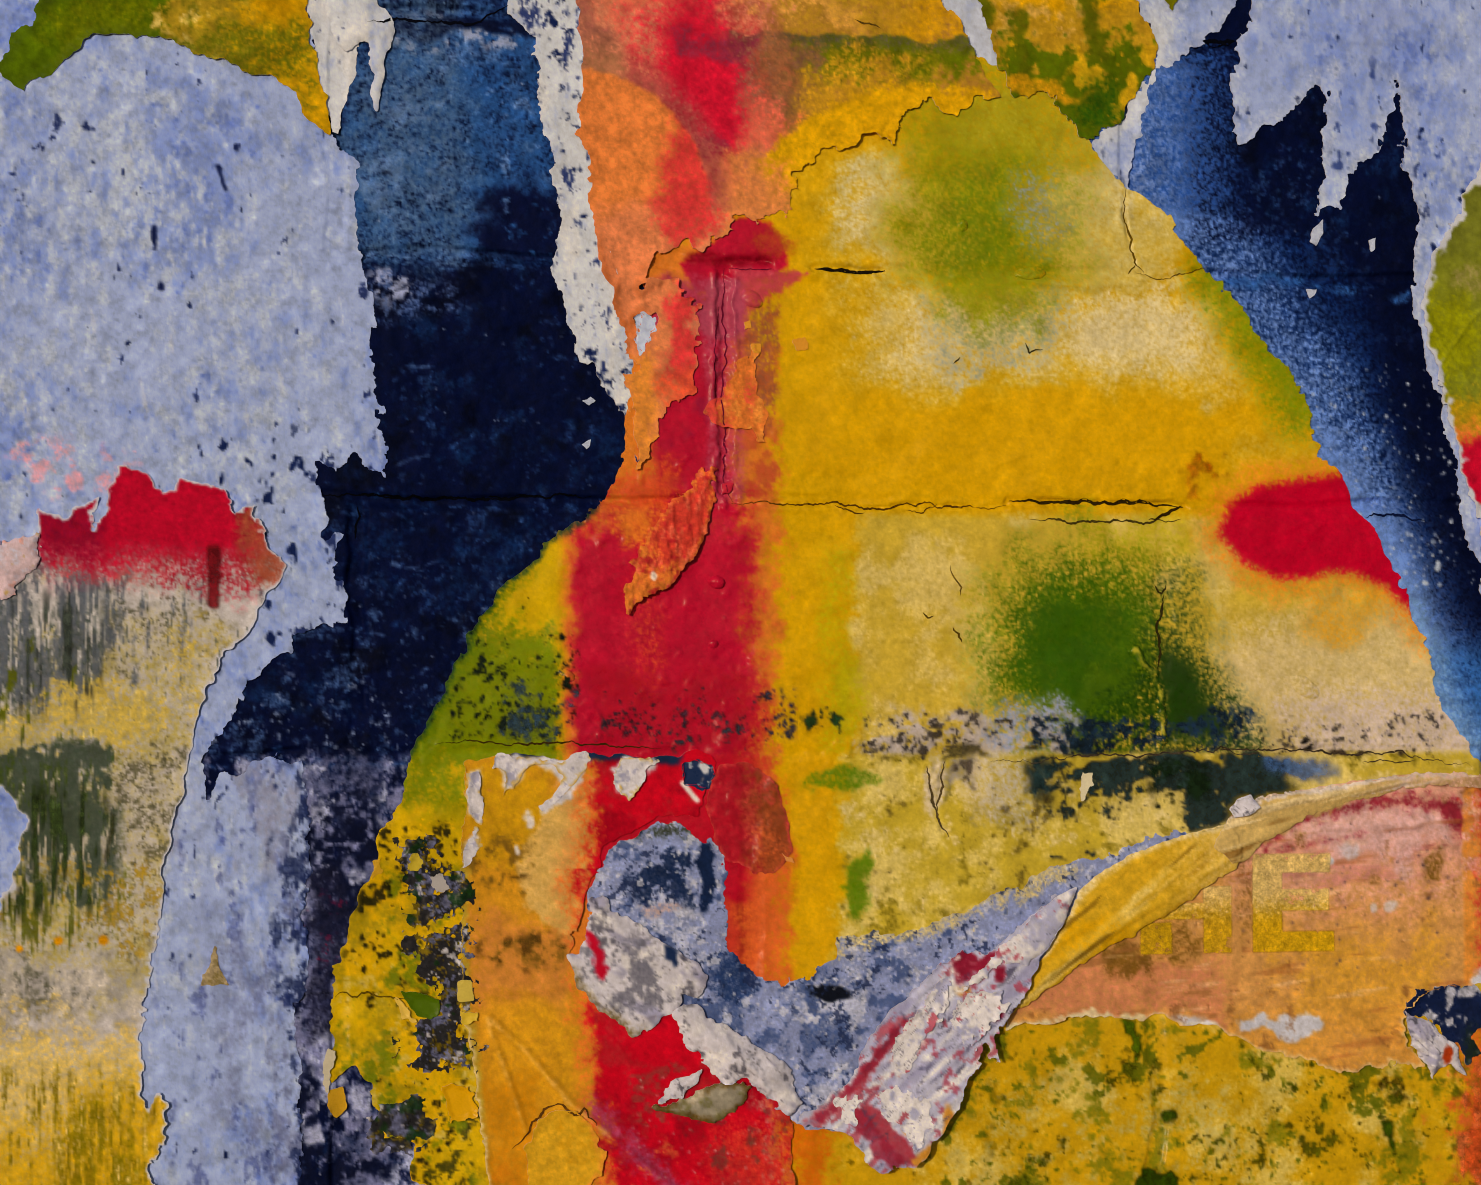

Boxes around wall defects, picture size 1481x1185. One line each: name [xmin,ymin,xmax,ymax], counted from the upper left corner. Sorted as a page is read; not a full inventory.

crack [816,266,885,274]
crack [1123,190,1207,280]
peeling [633,311,657,356]
peeling [703,320,769,442]
crack [714,268,1183,525]
peeling [623,466,734,615]
crack [1155,585,1166,669]
peeling [1079,773,1094,801]
peeling [1403,984,1481,1065]